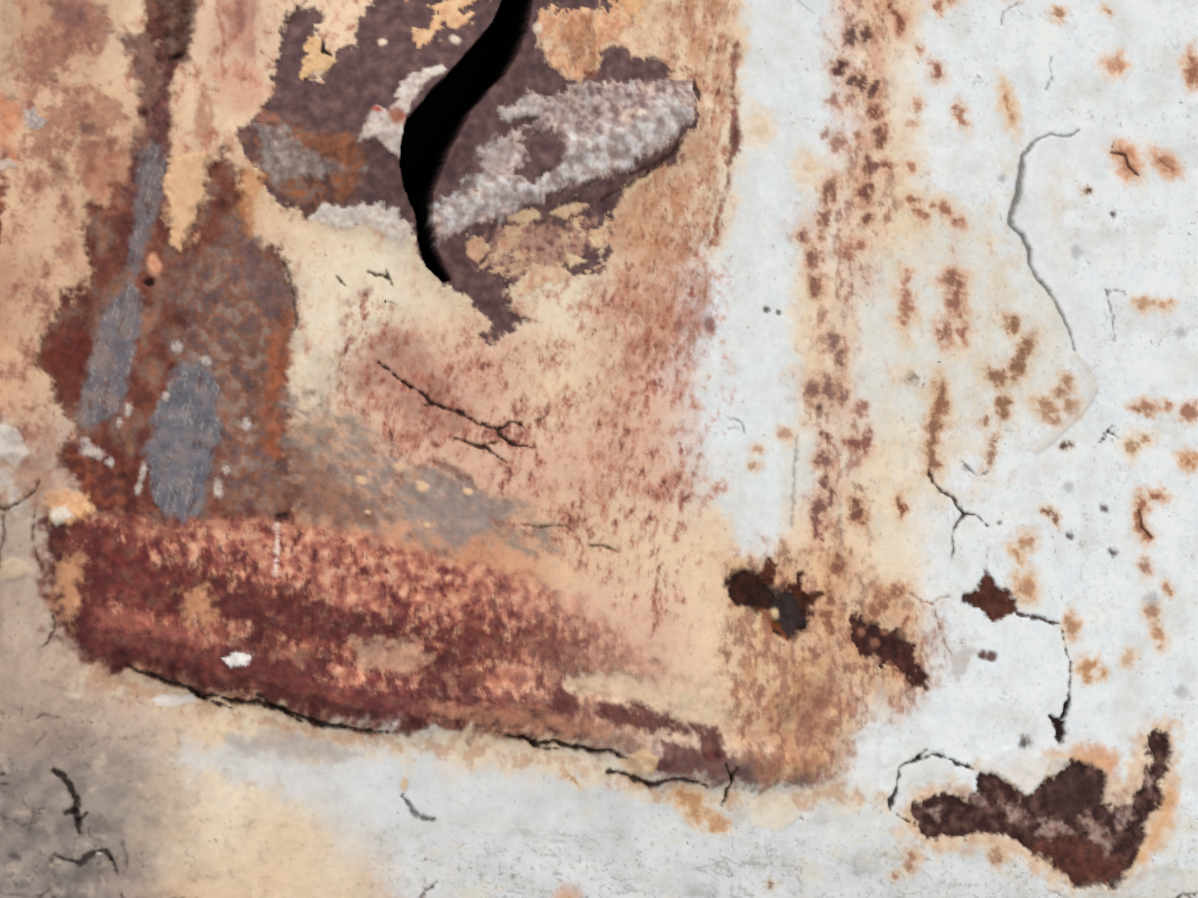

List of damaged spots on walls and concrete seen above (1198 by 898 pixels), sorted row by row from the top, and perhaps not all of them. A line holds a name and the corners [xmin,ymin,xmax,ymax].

crack [376,358,551,464]
corrosion [0,0,982,842]
corrosion [972,307,1085,482]
spalling [720,555,827,645]
peeling [36,640,81,693]
peeling [150,692,199,708]
crack [1015,610,1074,715]
crack [0,711,131,898]
peeling [617,747,661,775]
crack [886,748,976,825]
corrosion [885,756,1071,898]
corrosion [1024,710,1191,876]